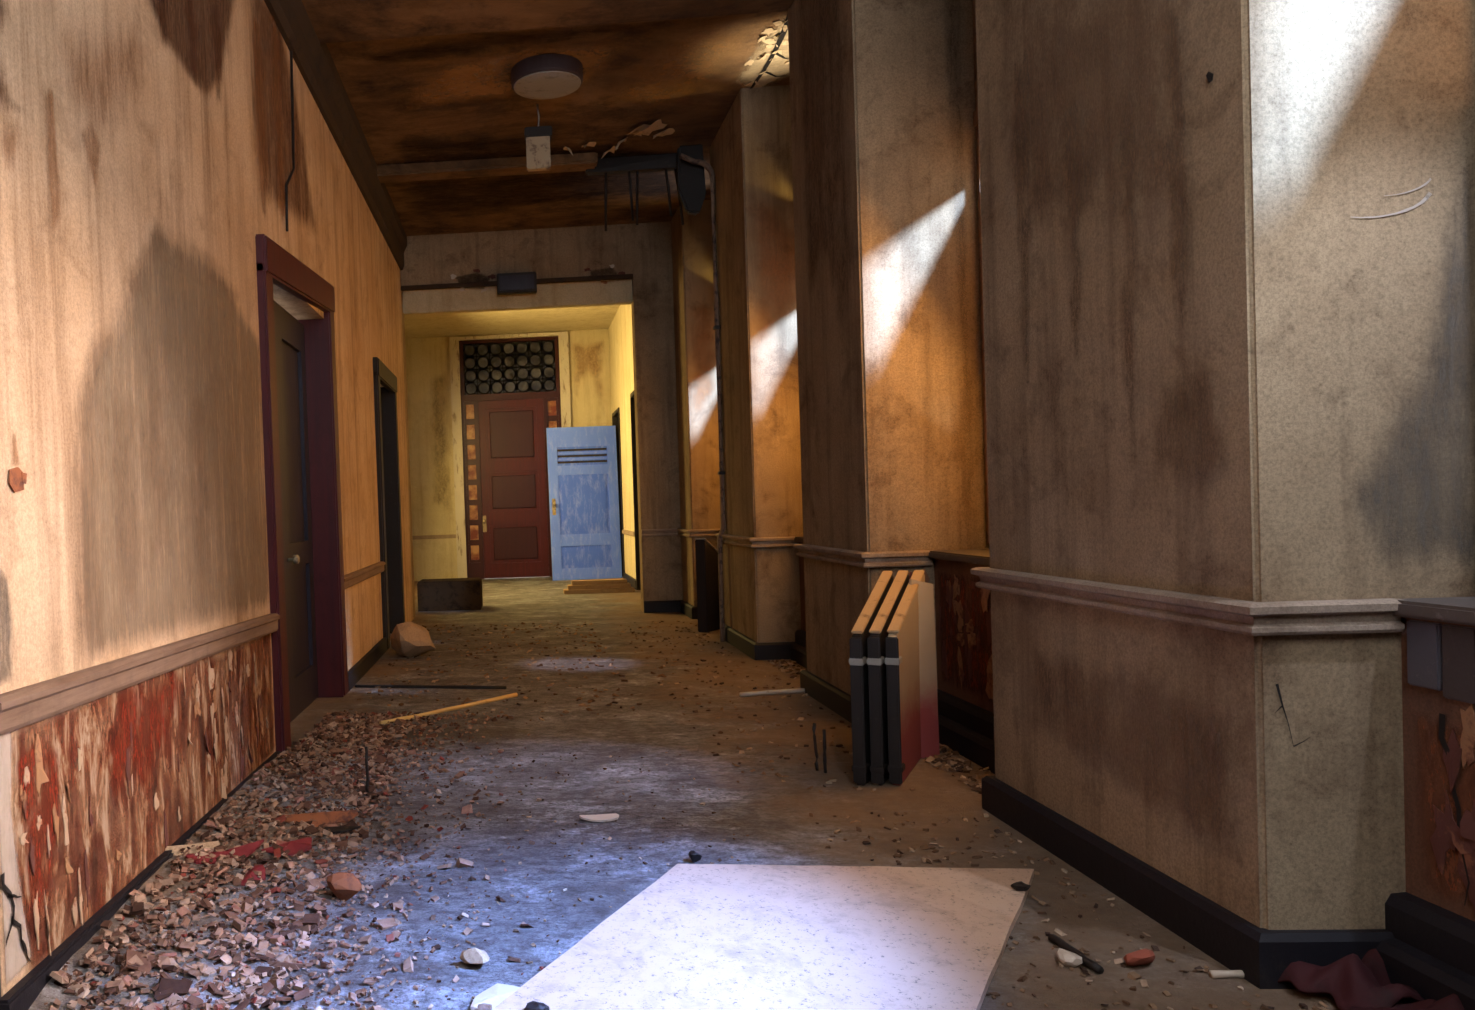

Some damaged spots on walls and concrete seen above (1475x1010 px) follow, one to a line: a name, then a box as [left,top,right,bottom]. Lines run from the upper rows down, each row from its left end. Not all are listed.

peeling [741,18,789,88]
peeling [0,634,274,981]
crack [1,872,31,962]